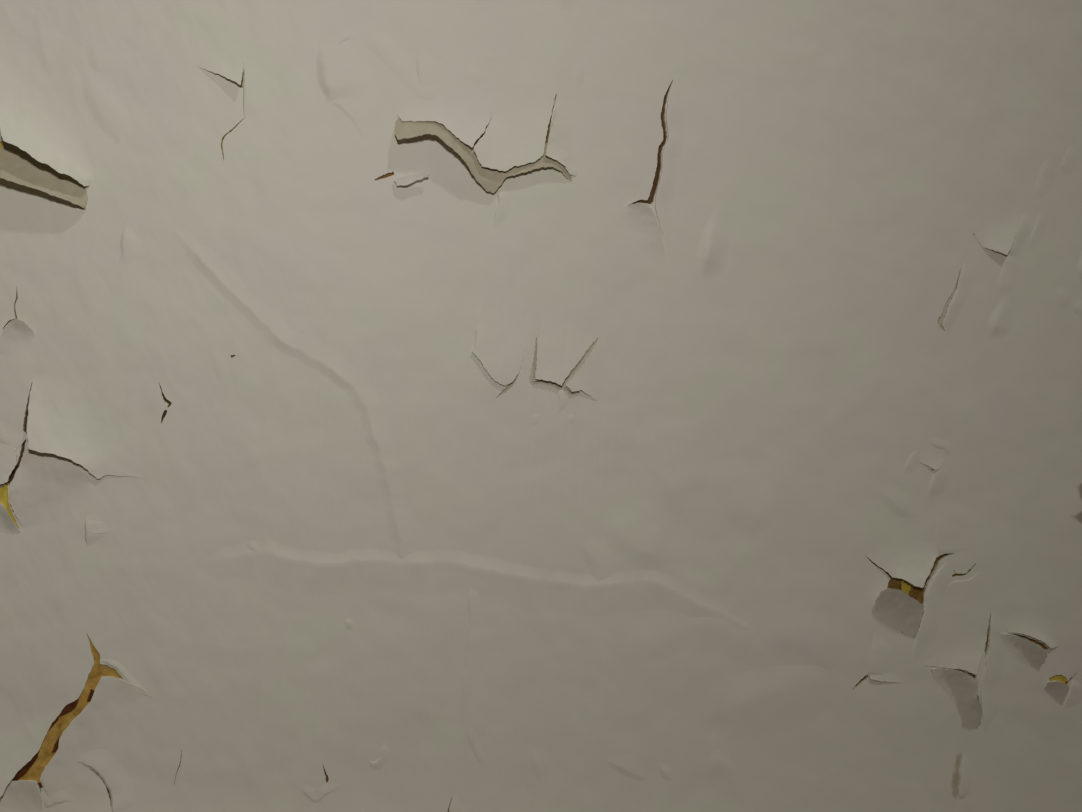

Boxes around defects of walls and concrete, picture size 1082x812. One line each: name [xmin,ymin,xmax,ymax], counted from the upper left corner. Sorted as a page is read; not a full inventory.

peeling [0,24,94,209]
peeling [395,79,577,231]
crack [606,71,685,269]
peeling [529,304,605,424]
peeling [0,373,143,545]
peeling [0,636,154,812]
peeling [867,514,1060,736]
peeling [1045,675,1082,709]